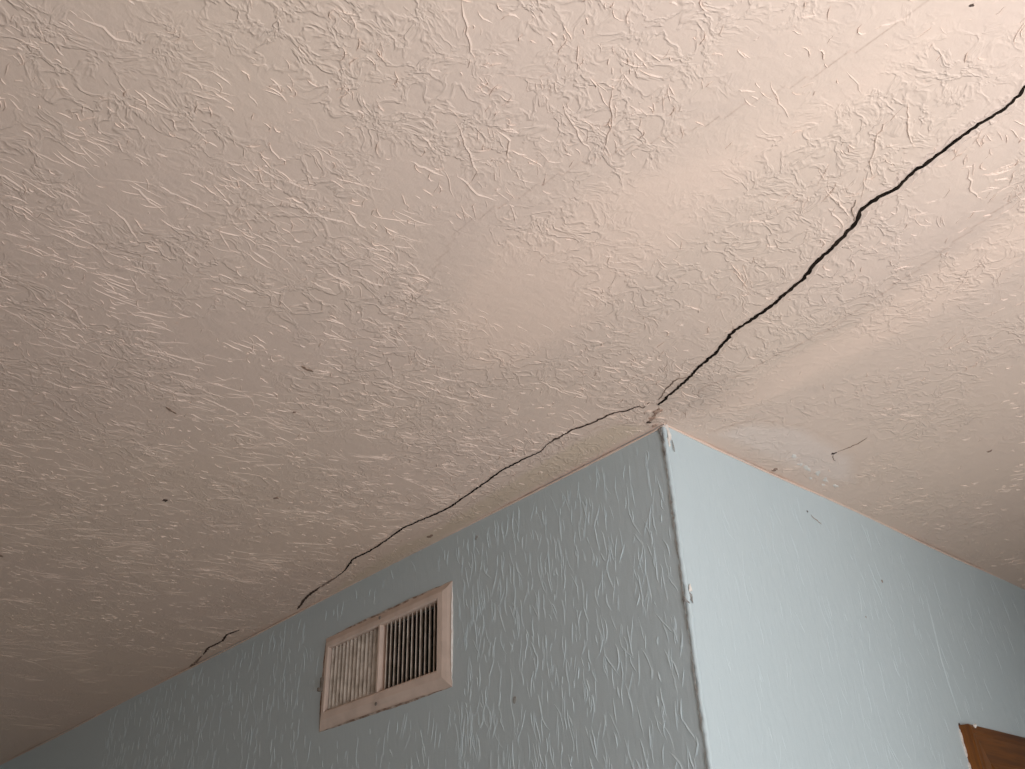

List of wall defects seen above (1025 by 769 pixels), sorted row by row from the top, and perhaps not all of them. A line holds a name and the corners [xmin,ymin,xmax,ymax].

crack [190,630,239,667]
crack [297,76,1025,769]